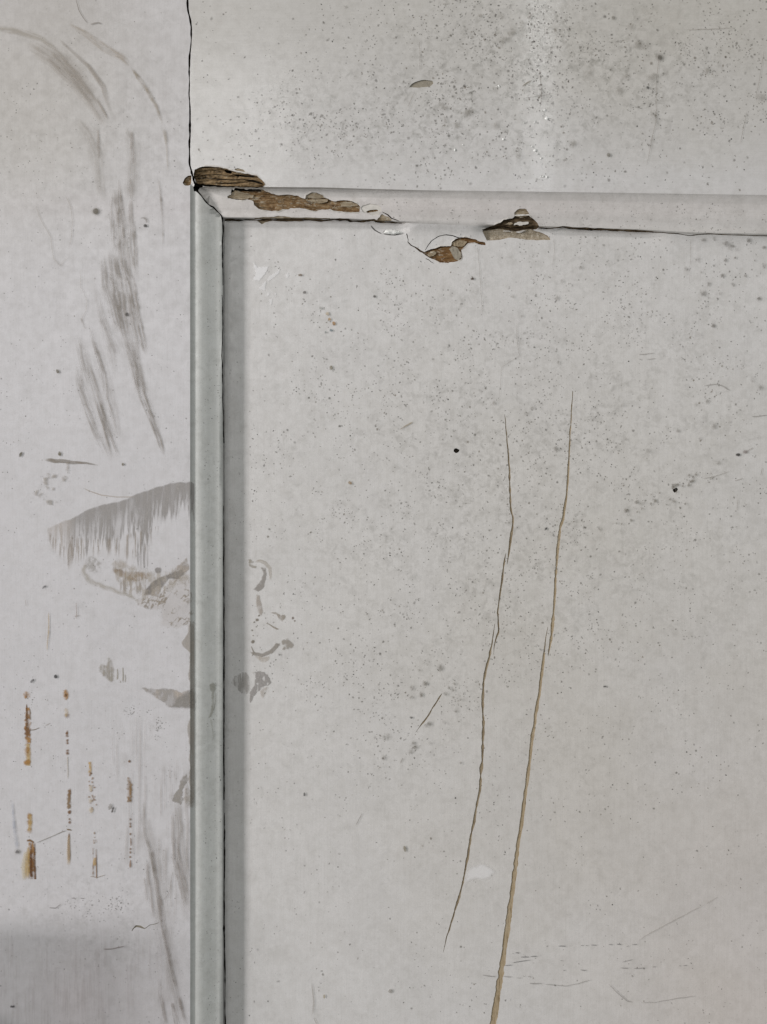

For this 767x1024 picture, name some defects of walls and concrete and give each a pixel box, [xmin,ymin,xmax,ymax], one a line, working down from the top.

peeling [183,165,391,221]
crack [186,0,401,442]
peeling [406,209,550,263]
crack [538,226,767,236]
leakage [114,564,191,626]
rust [24,692,50,766]
crack [443,418,514,952]
crack [490,391,573,1024]
rust [22,814,36,879]